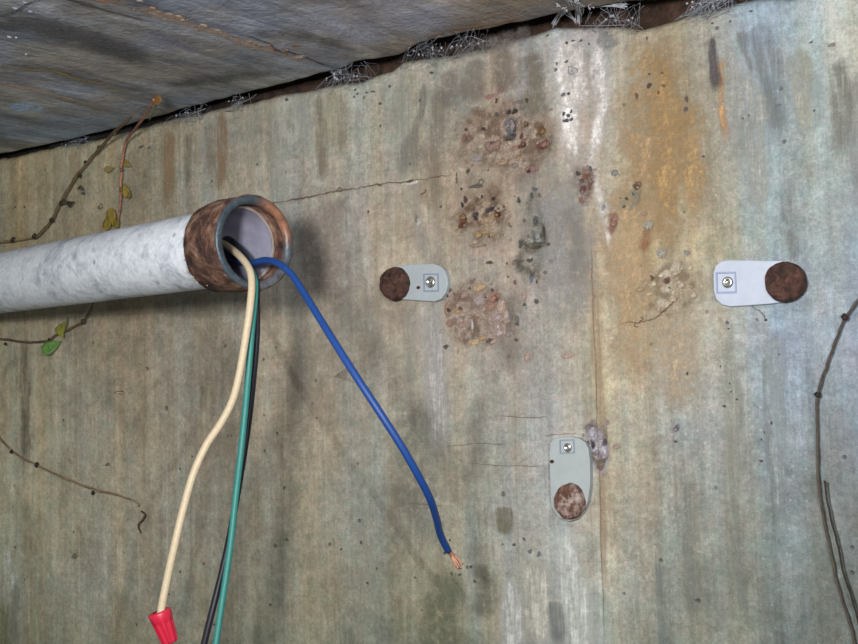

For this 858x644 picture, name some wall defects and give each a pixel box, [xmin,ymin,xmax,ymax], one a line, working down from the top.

crack [272,172,457,227]
spalling [453,98,573,306]
peeling [440,280,519,352]
spalling [582,420,620,472]
damp [500,534,589,644]